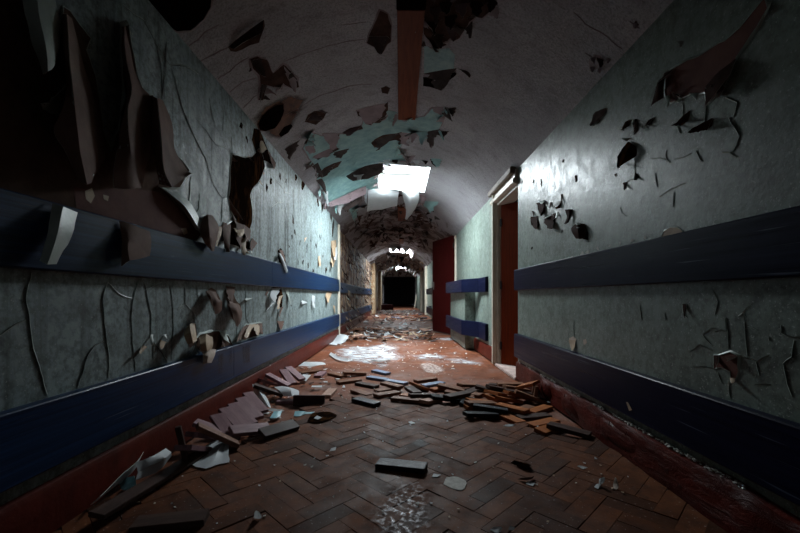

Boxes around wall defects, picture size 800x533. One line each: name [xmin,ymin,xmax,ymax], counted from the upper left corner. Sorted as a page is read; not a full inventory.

peeling [366,9,392,55]
peeling [422,0,499,91]
peeling [651,0,771,152]
peeling [0,0,305,267]
peeling [614,117,655,177]
peeling [285,86,456,332]
peeling [530,194,588,240]
crack [0,272,48,394]
crack [78,282,199,387]
peeling [184,286,263,364]
peeling [265,287,292,330]
spalling [690,318,769,397]